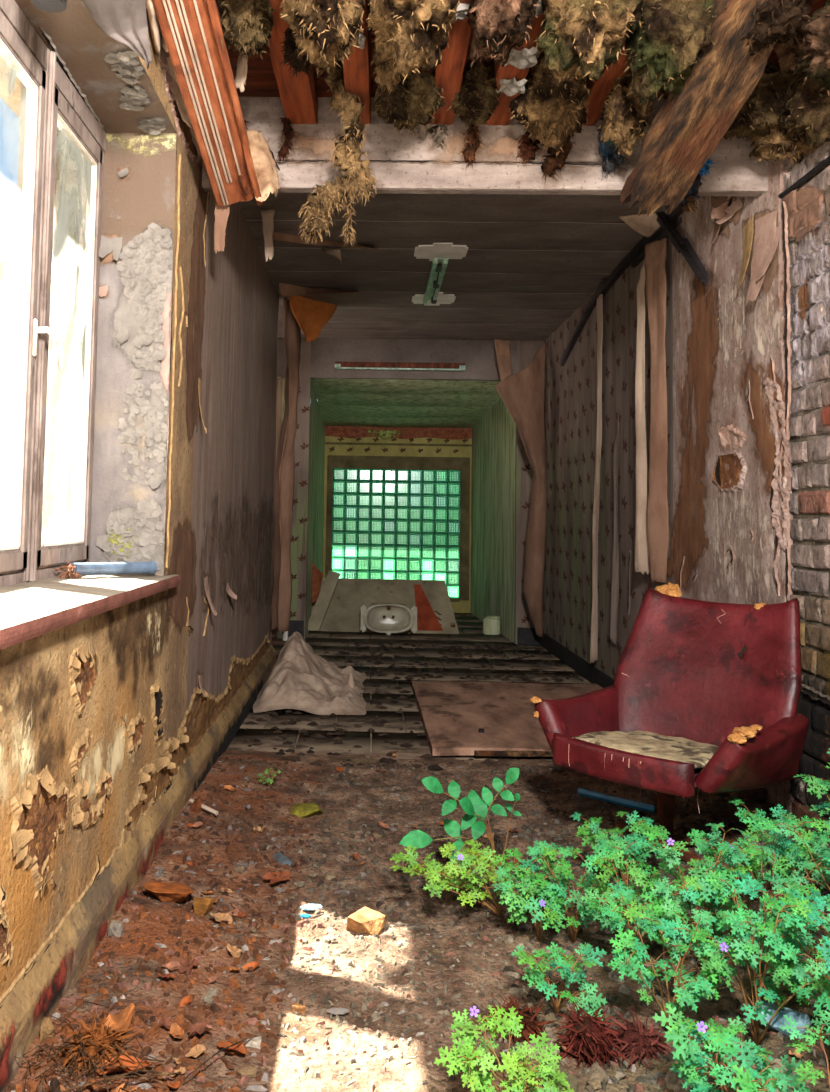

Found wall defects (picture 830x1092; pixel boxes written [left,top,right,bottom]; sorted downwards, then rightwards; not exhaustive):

flaking render [103,43,201,167]
flaking render [711,196,781,306]
peeling [160,278,172,393]
flaking render [711,424,747,493]
leakage [106,496,272,696]
leakage [0,656,65,789]
flaking render [68,643,99,714]
leakage [77,715,135,793]
flaking render [10,727,113,900]